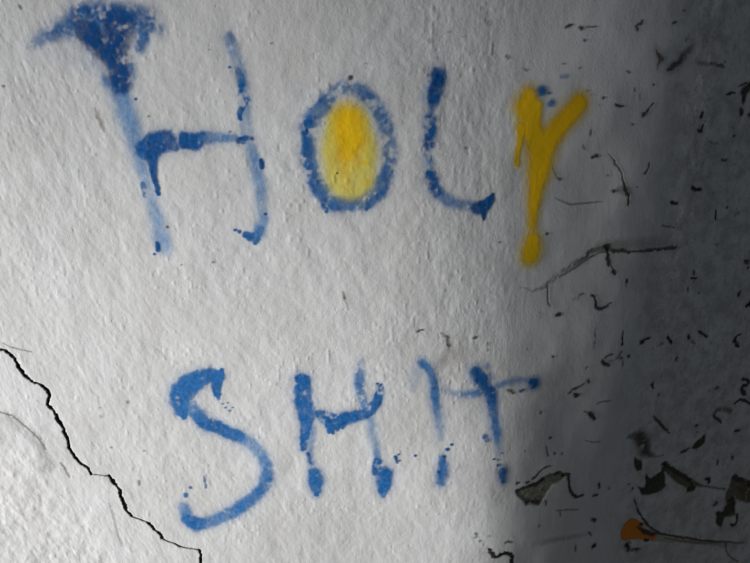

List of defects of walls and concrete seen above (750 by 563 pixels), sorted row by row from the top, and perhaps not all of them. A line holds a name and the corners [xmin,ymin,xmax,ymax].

crack [547,244,677,302]
crack [0,348,202,563]
spalling [516,465,584,505]
peeling [628,432,750,527]